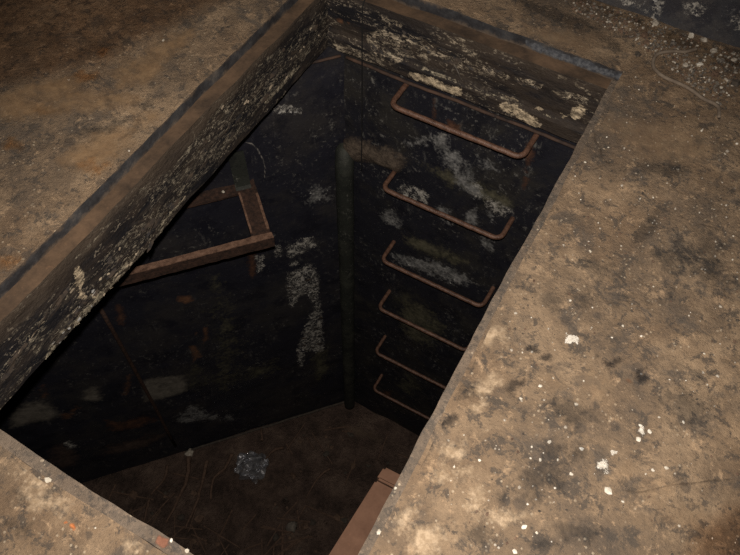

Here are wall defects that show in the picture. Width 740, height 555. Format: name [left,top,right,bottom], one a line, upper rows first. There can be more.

leakage [407,134,510,220]
leakage [400,186,429,204]
efflorescence [412,257,462,282]